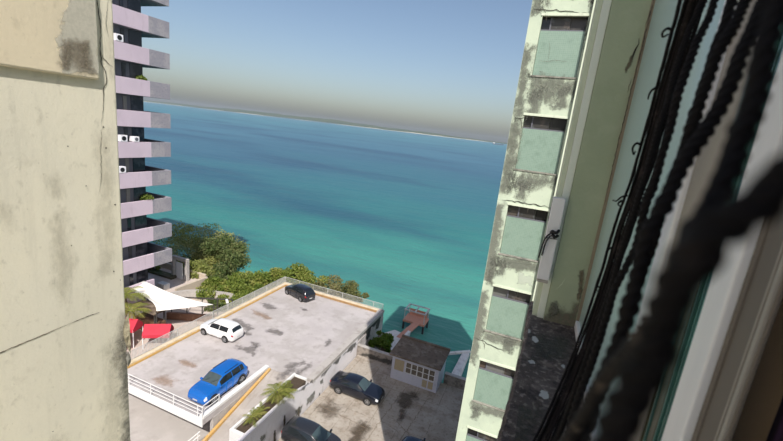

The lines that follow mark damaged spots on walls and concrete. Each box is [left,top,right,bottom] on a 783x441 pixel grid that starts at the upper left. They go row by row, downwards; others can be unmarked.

peeling [55,0,99,74]
leakage [531,0,550,16]
crack [97,0,114,186]
leakage [500,46,577,199]
crack [604,0,654,204]
leakage [484,205,537,284]
crack [0,312,99,353]
leakage [469,291,572,368]
leakage [544,270,584,327]